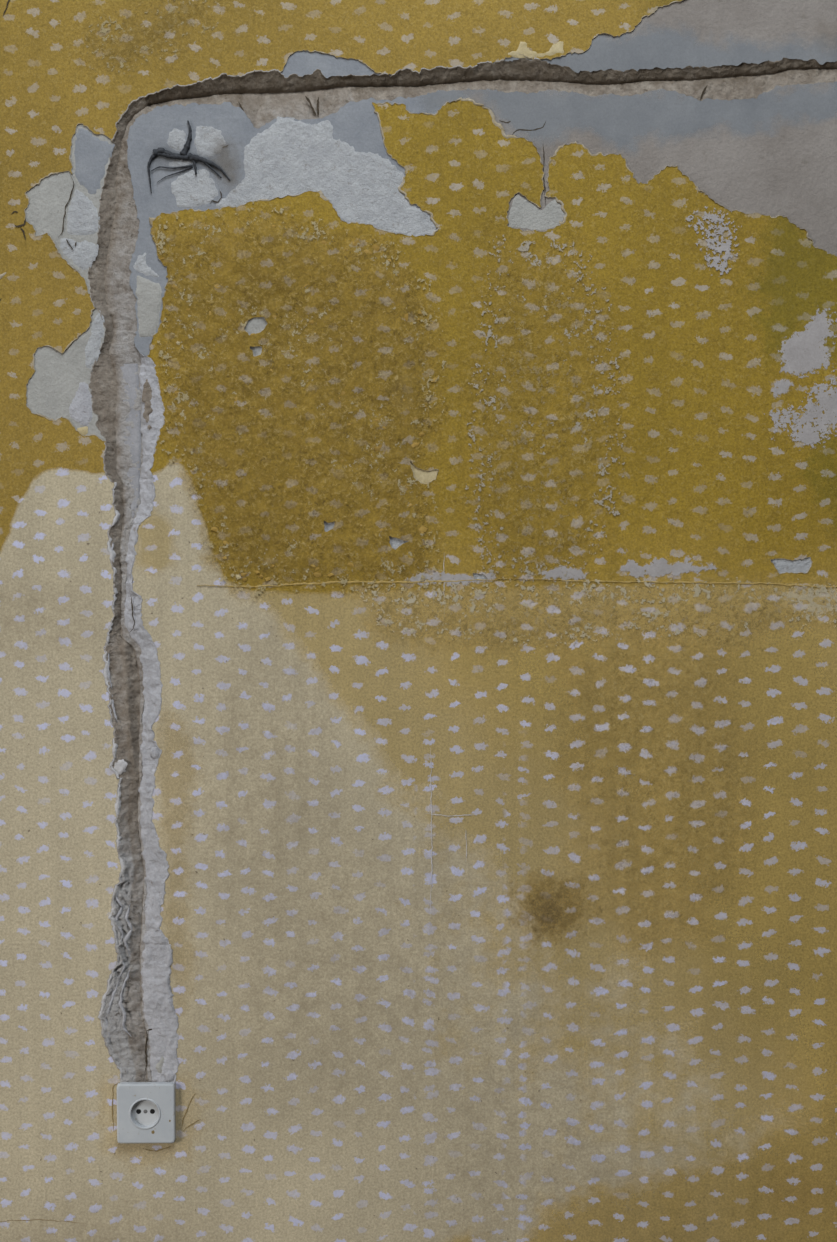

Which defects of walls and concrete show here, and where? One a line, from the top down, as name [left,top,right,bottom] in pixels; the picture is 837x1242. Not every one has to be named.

peeling [79,0,219,77]
peeling [280,50,392,78]
peeling [493,0,837,73]
peeling [24,81,837,647]
leakage [148,100,837,1242]